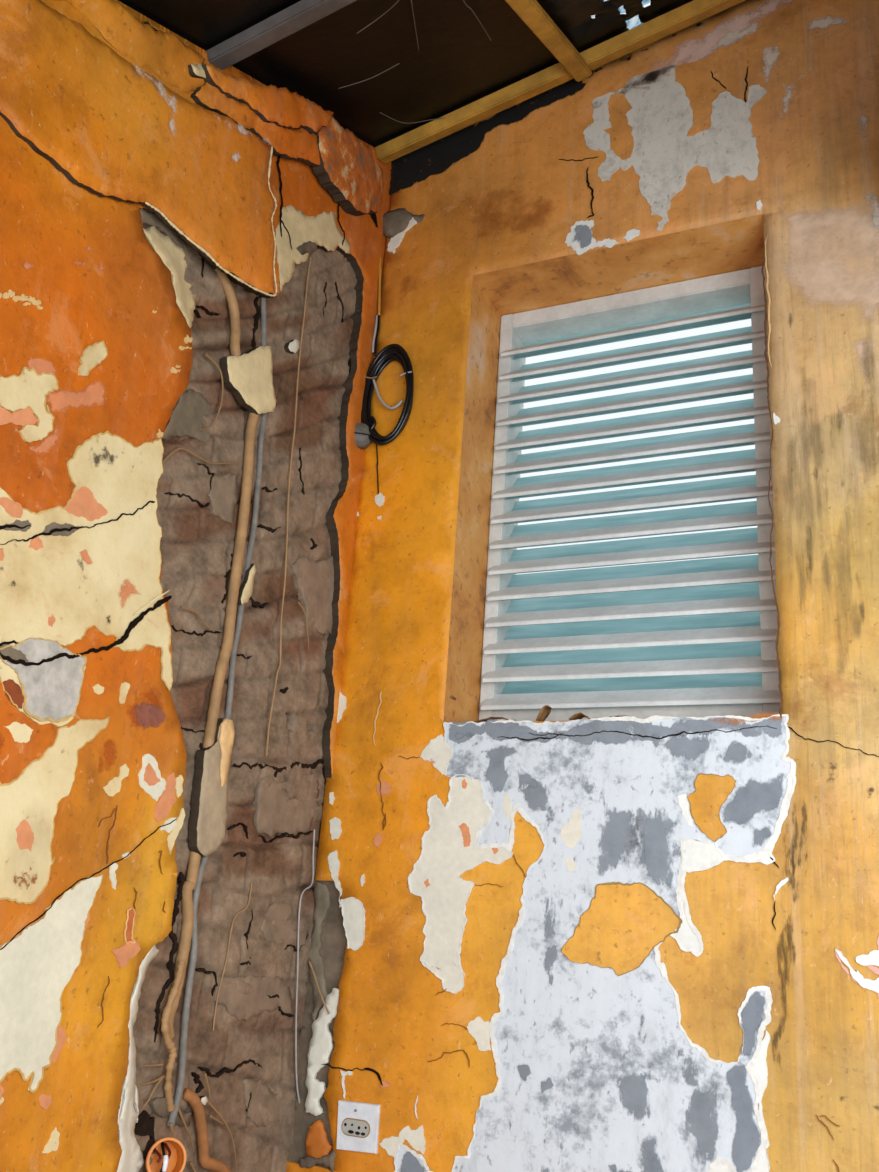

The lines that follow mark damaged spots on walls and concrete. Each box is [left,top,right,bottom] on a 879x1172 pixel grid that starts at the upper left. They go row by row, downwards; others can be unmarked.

crack [558,156,599,218]
peeling [583,0,793,231]
crack [0,501,155,545]
crack [498,235,879,757]
crack [0,590,172,666]
spalling [0,205,366,1172]
crack [0,806,177,950]
peeling [408,705,796,1172]
damp [773,918,795,1062]
damp [789,804,807,901]
peeling [835,937,879,997]
peeling [379,1125,433,1172]